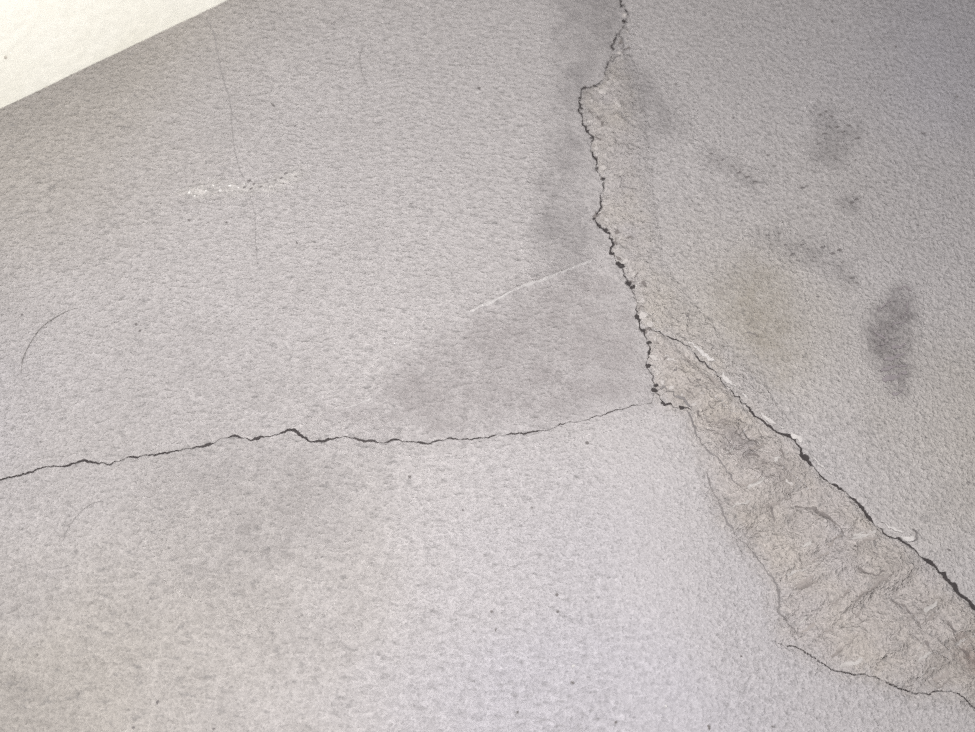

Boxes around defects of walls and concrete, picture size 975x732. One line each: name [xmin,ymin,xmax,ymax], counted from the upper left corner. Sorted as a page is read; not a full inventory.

crack [206,18,262,268]
crack [578,0,628,190]
crack [0,196,975,610]
spalling [580,13,975,726]
crack [706,471,975,709]